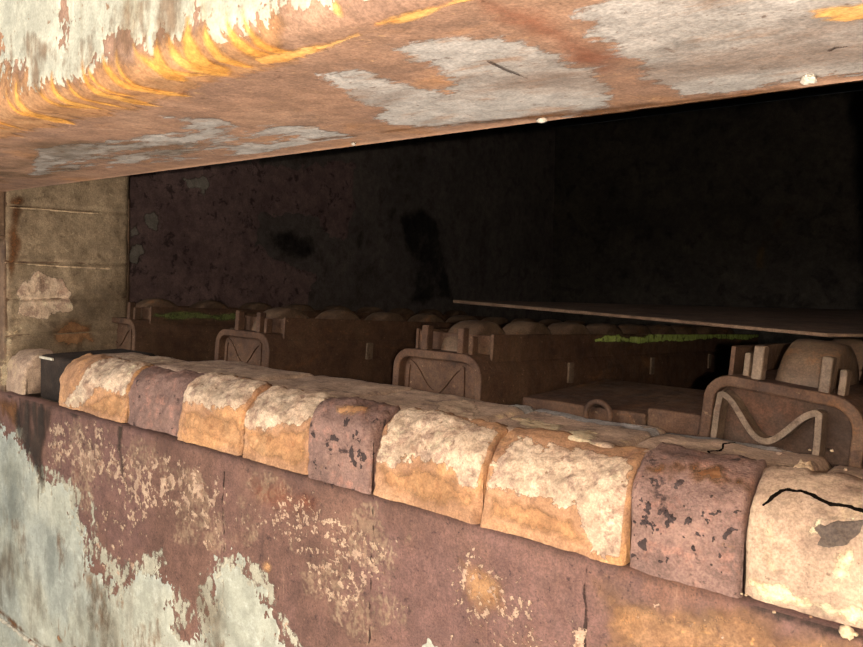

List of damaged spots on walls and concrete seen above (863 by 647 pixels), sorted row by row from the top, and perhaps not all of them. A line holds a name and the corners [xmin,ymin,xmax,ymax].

peeling [0,0,335,98]
corrosion [0,0,354,138]
corrosion [377,8,437,25]
peeling [316,36,614,128]
corrosion [460,88,791,124]
peeling [570,0,863,95]
corrosion [814,4,863,22]
peeling [0,417,387,647]
spalling [631,497,738,573]
crack [762,488,863,513]
spalling [814,520,863,548]
corrosion [613,608,853,647]